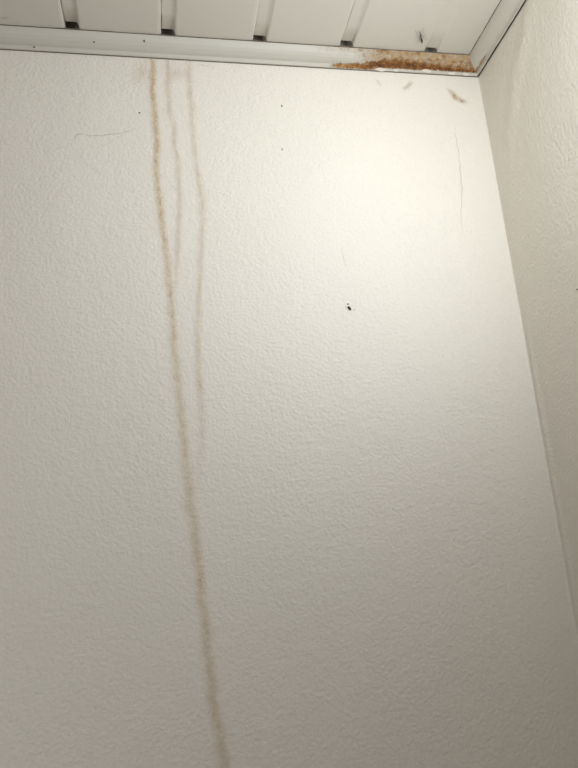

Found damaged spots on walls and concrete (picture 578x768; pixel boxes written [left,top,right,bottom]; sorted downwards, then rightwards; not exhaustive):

rust [333,49,486,76]